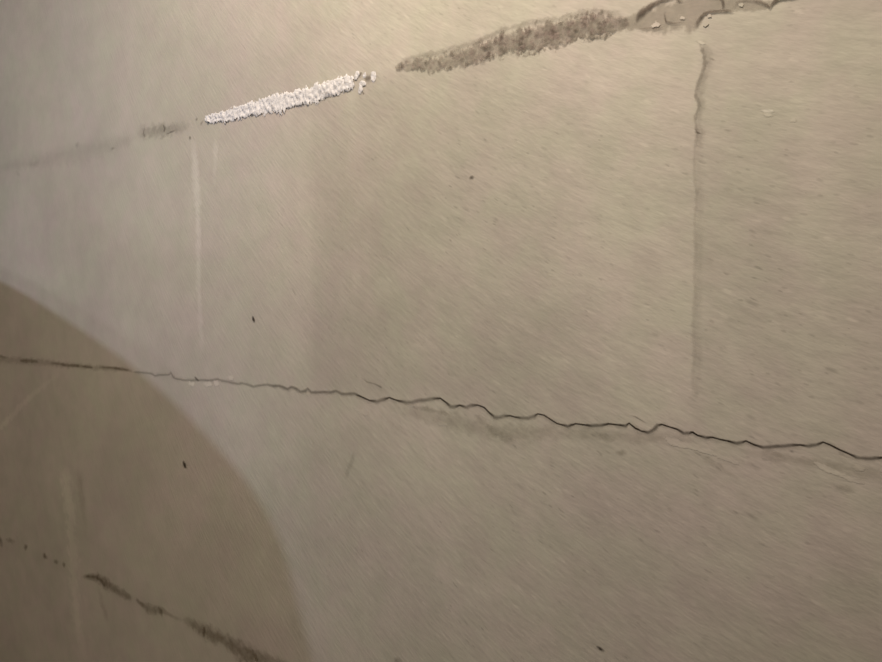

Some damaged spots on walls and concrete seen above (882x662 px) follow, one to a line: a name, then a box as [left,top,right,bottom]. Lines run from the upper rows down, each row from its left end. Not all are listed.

spalling [399,11,625,71]
crack [435,398,761,447]
crack [793,442,856,457]